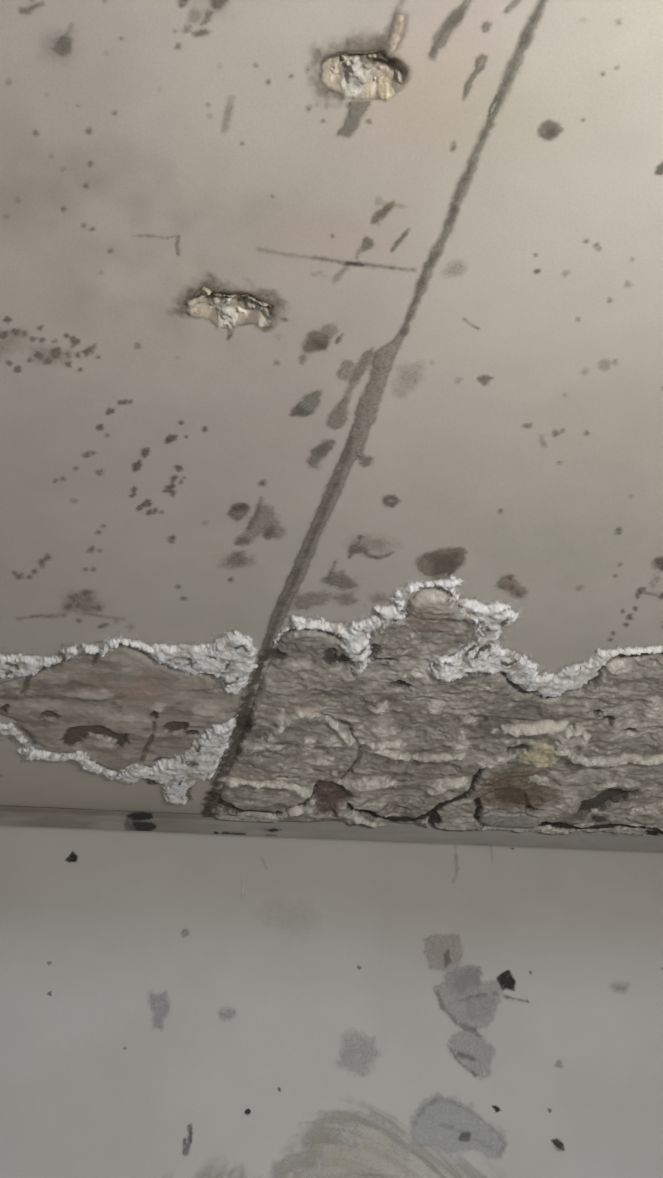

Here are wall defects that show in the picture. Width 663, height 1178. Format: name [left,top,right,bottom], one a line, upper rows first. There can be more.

spalling [319,10,410,136]
spalling [178,278,280,339]
crack [187,0,546,827]
water stain [348,536,390,559]
crack [0,661,97,745]
water stain [0,715,238,805]
water stain [0,630,258,695]
crack [139,722,155,762]
spalling [0,588,663,836]
water stain [273,548,663,698]
water stain [126,812,156,831]
crack [538,821,663,836]